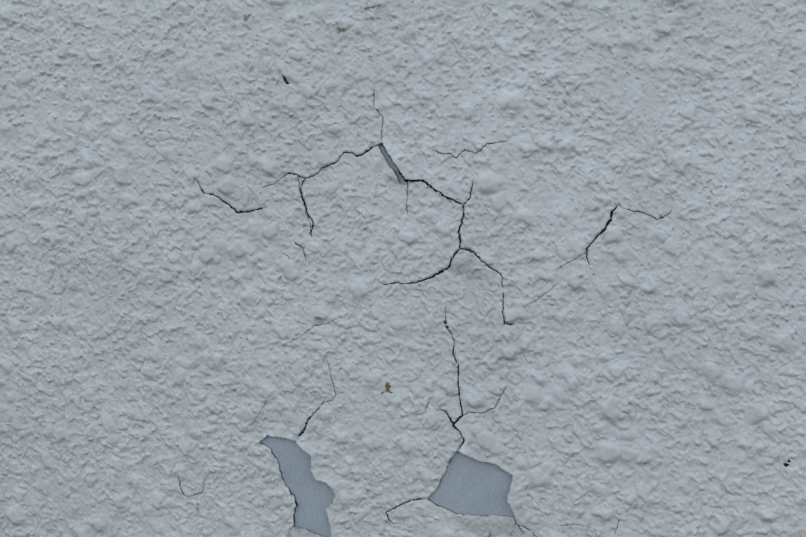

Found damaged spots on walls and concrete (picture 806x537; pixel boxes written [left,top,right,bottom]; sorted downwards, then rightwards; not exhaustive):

crack [196,89,514,325]
crack [529,204,672,304]
crack [299,359,336,437]
peeling [261,391,394,537]
crack [385,498,426,520]
crack [413,308,507,448]
peeling [428,339,574,537]